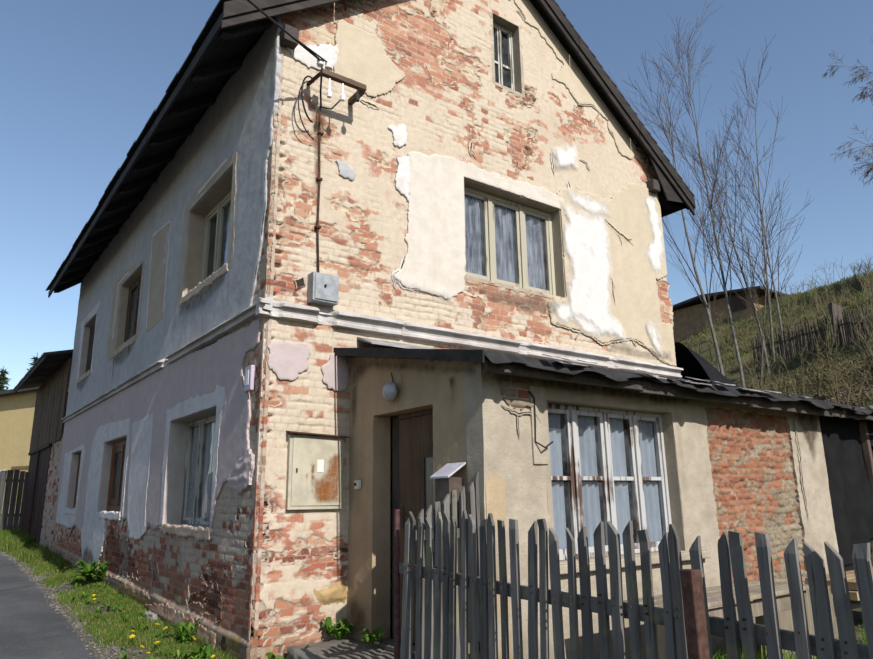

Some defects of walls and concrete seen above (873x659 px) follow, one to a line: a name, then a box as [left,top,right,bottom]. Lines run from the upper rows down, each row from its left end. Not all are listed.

spalling [280,0,483,144]
crack [572,95,620,154]
spalling [268,117,356,258]
peeling [367,124,411,201]
crack [550,150,572,188]
crack [602,216,633,245]
crack [548,304,677,367]
spalling [656,280,674,332]
peeling [253,341,311,413]
rust [312,455,339,501]
spalling [102,524,154,600]
spalling [185,485,348,659]